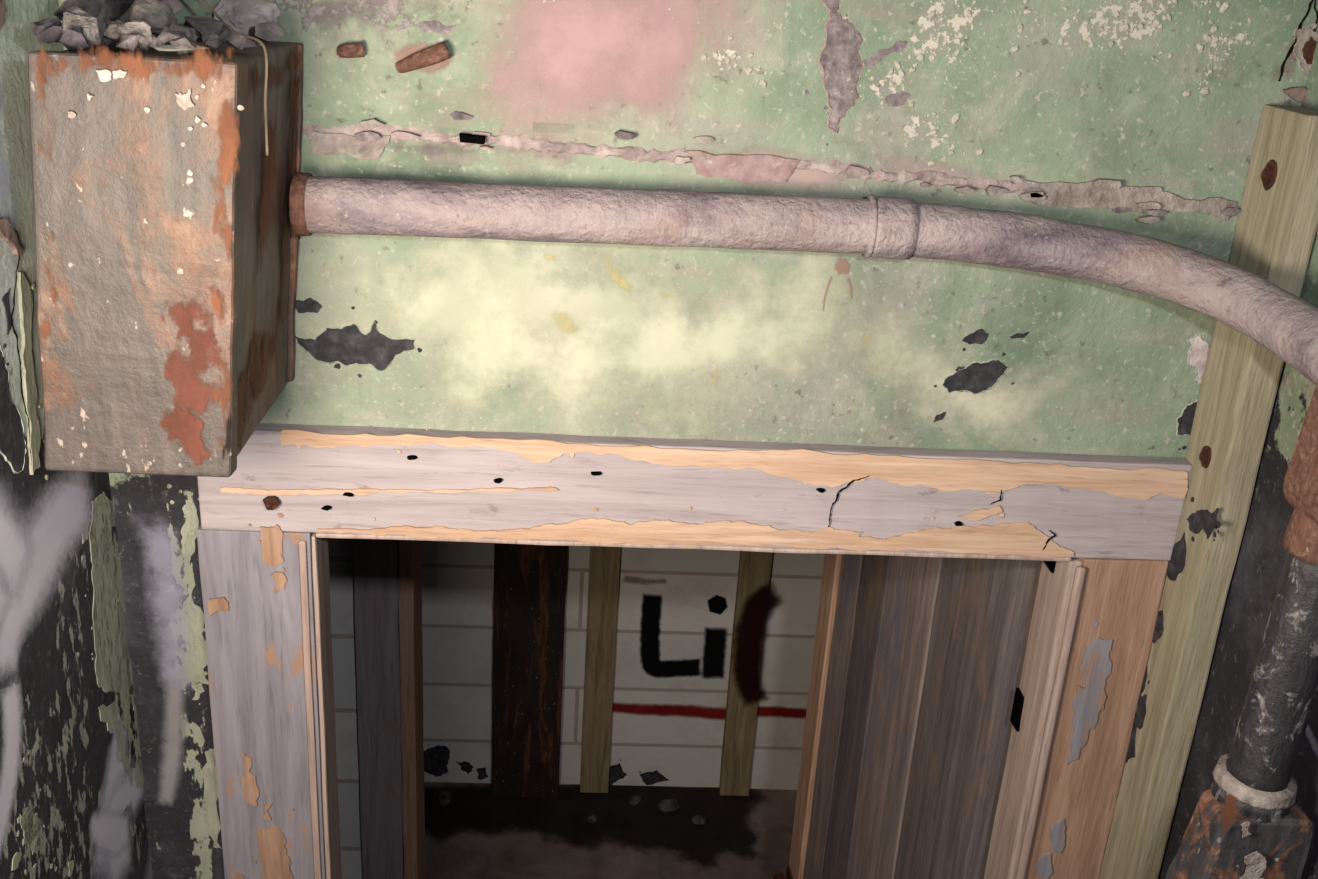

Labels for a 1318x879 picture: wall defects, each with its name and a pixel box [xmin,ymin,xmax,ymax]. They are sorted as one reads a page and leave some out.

crack [1278,0,1318,81]
spalling [302,0,1242,224]
peeling [295,298,322,313]
peeling [295,306,422,378]
peeling [934,329,1014,394]
peeling [280,428,1222,581]
peeling [1152,610,1164,644]
peeling [3,492,144,879]
peeling [1126,665,1149,763]